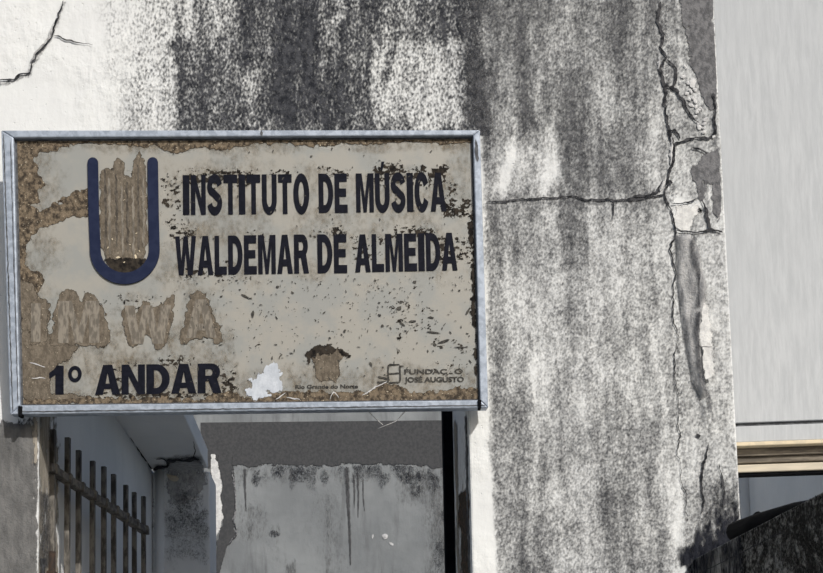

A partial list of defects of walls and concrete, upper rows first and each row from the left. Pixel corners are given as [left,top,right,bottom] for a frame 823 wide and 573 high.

crack [0,1,91,85]
spalling [679,0,717,138]
spalling [674,149,722,231]
damp [126,0,679,573]
crack [488,2,726,520]
peeling [699,303,715,379]
flaking render [458,488,470,573]
damp [678,478,801,573]